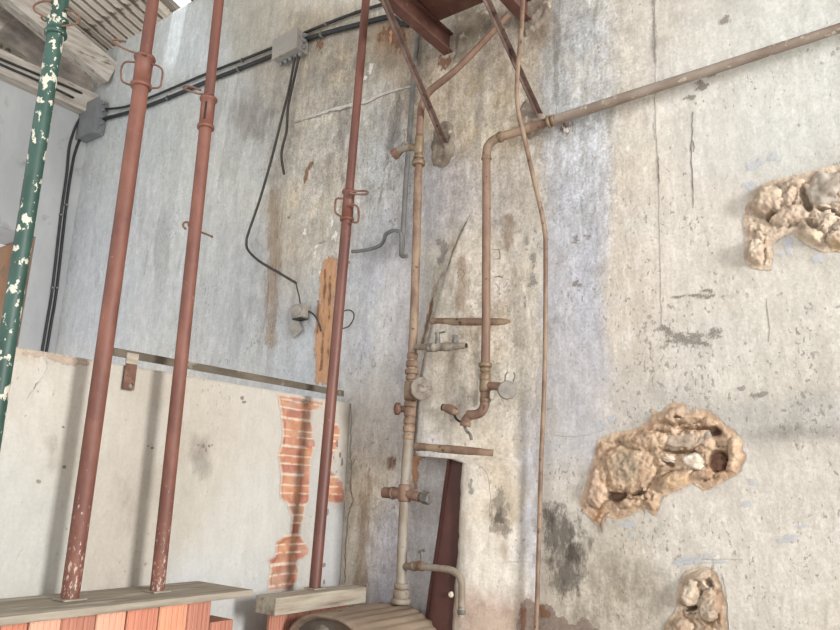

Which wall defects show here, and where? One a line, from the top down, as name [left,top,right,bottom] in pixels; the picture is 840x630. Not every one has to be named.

crack [294,86,410,123]
crack [688,112,696,206]
spalling [742,165,840,271]
flaking render [266,394,324,592]
spalling [580,403,746,537]
leakage [544,501,586,599]
spalling [664,553,728,630]